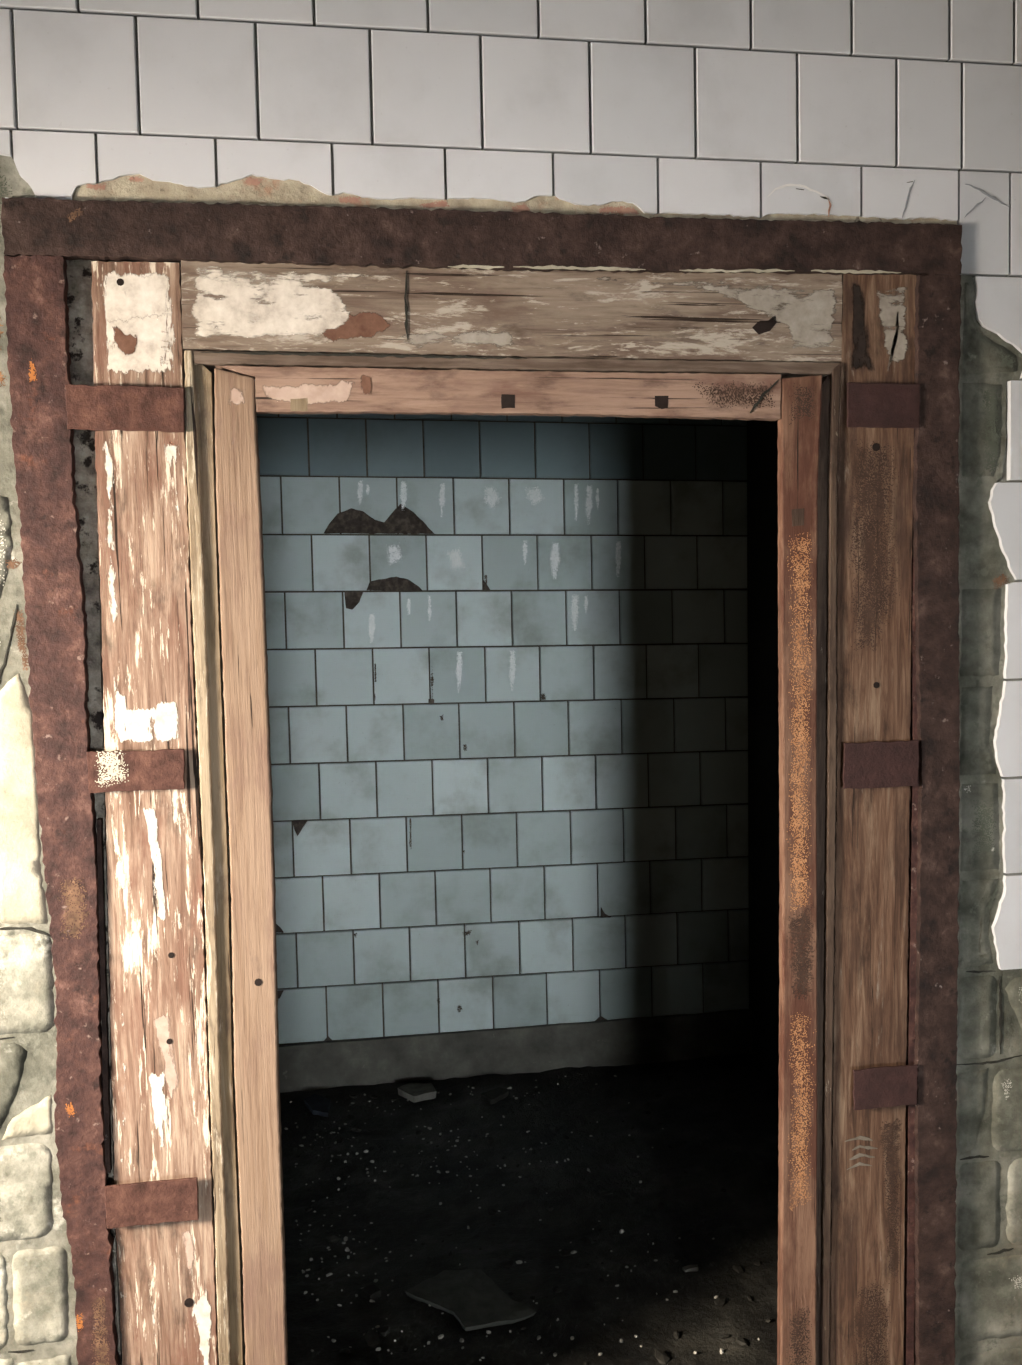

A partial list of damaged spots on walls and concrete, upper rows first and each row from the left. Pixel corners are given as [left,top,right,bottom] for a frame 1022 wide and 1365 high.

spalling [72,174,957,225]
peeling [103,271,175,374]
peeling [192,267,369,338]
spalling [324,504,434,534]
spalling [344,577,422,610]
spalling [0,155,78,1365]
spalling [954,275,1022,1365]
peeling [143,808,165,921]
peeling [149,1015,178,1150]
peeling [182,1231,194,1275]
peeling [192,1291,211,1365]